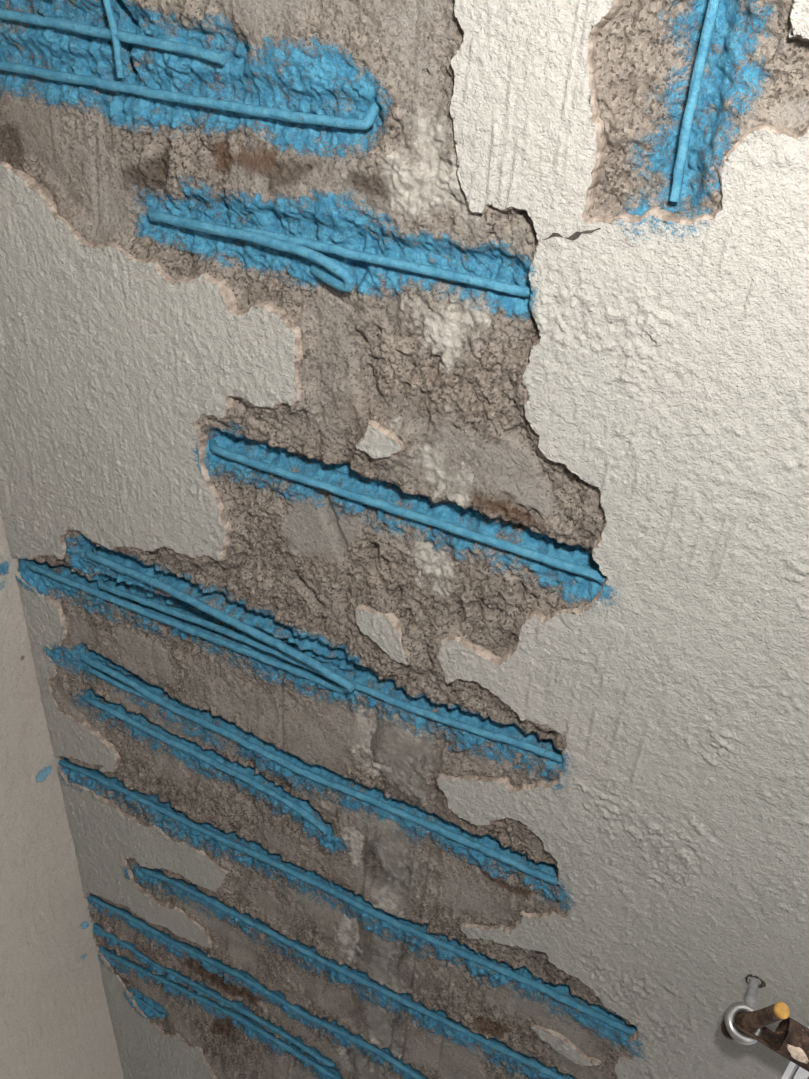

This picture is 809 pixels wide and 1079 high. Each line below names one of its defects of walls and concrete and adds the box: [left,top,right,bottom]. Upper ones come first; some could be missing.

crack [545,228,601,241]
spalling [582,0,809,238]
spalling [0,0,643,1079]